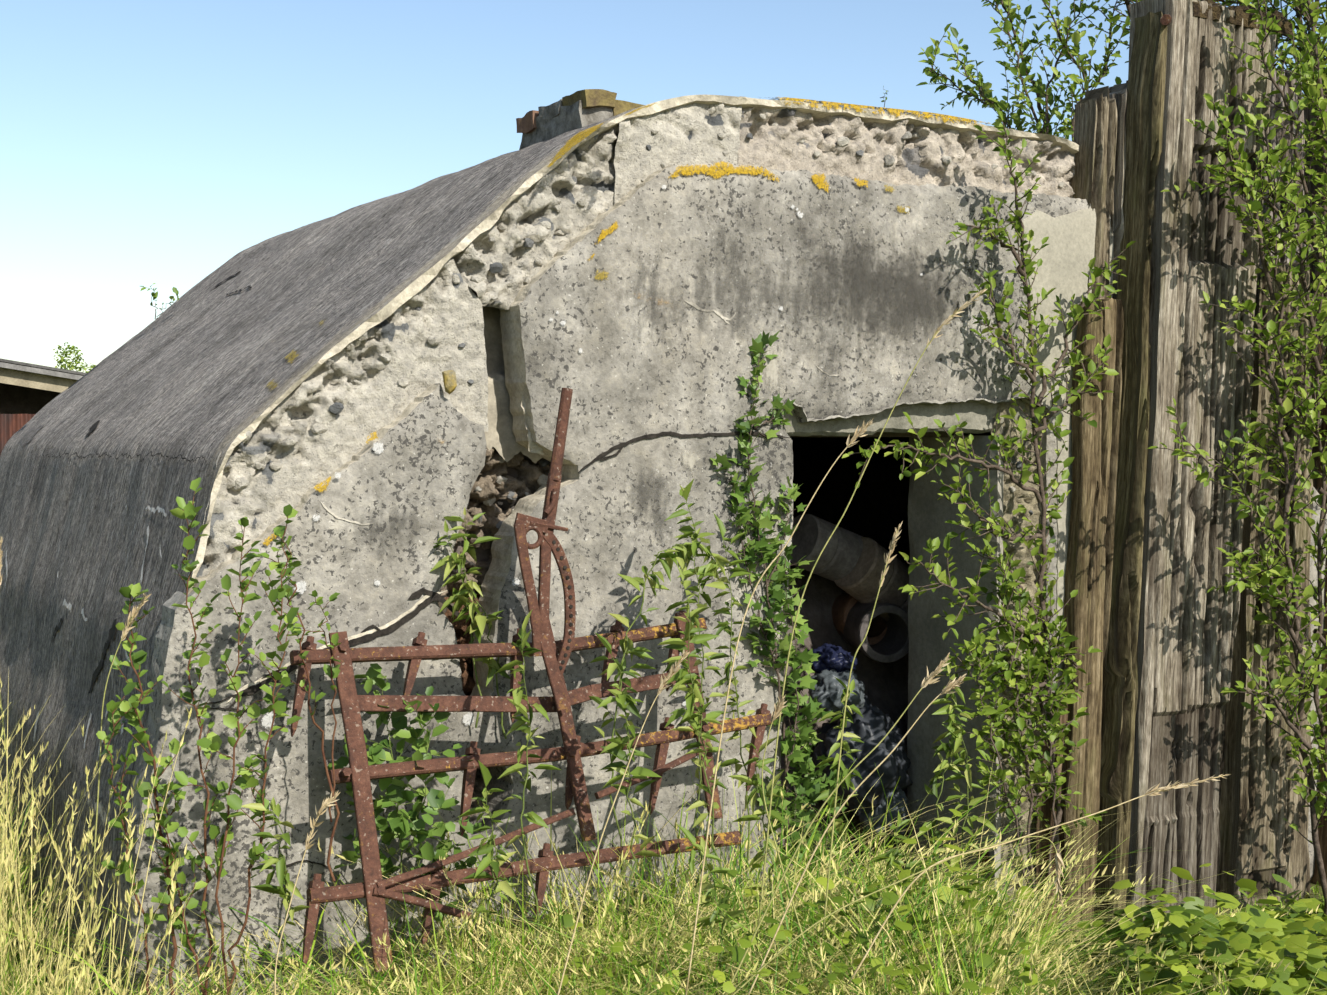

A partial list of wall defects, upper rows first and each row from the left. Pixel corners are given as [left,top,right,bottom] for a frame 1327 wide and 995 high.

spalling [193,96,1114,922]
crack [578,426,789,473]
crack [206,588,460,711]